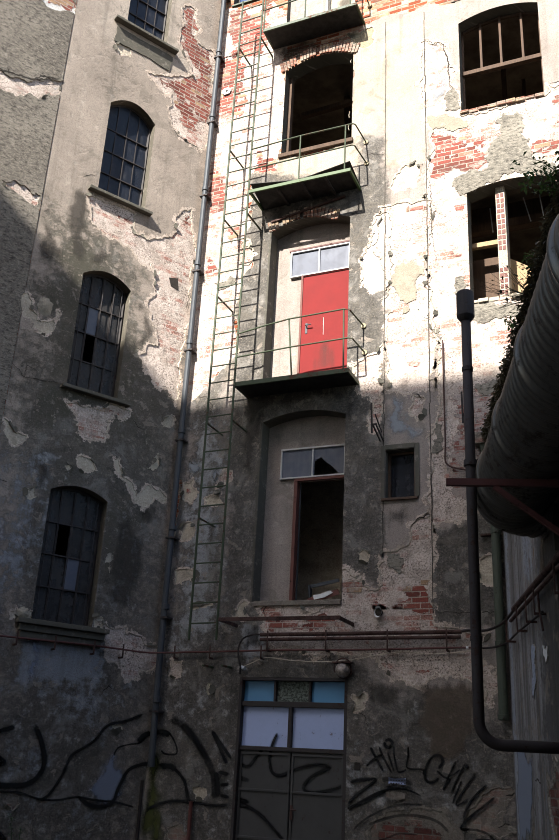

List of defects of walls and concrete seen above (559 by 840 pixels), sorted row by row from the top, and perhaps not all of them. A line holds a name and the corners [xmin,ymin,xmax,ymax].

peeling [42,0,77,15]
peeling [0,69,64,99]
crack [423,39,455,89]
peeling [2,180,40,206]
peeling [85,1,288,428]
peeling [231,37,559,693]
peeling [63,397,133,444]
peeling [112,456,167,513]
water stain [112,520,142,604]
peeling [92,612,158,684]
peeling [482,631,498,711]
peeling [364,784,517,840]